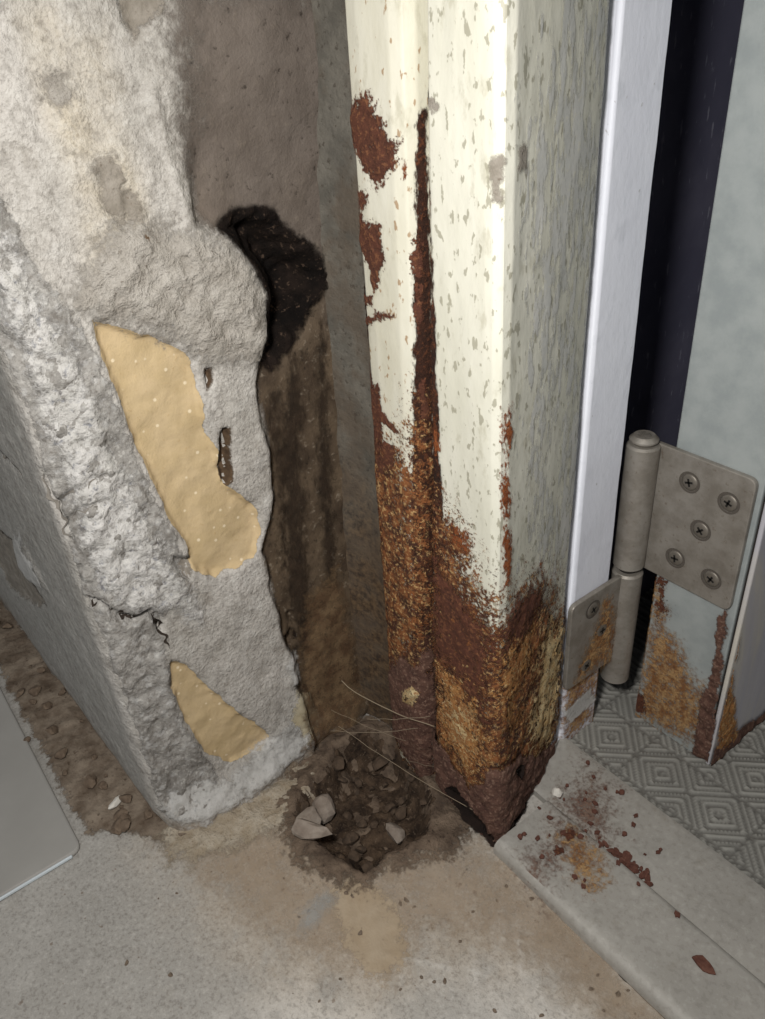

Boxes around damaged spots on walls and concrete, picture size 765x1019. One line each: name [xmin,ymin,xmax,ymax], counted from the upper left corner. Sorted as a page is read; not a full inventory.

flaking render [93,150,146,230]
damp [171,0,322,257]
spalling [217,205,329,371]
spalling [0,198,269,819]
damp [256,291,369,722]
corrosion [350,88,662,893]
corrosion [635,576,765,766]
corrosion [692,955,716,975]